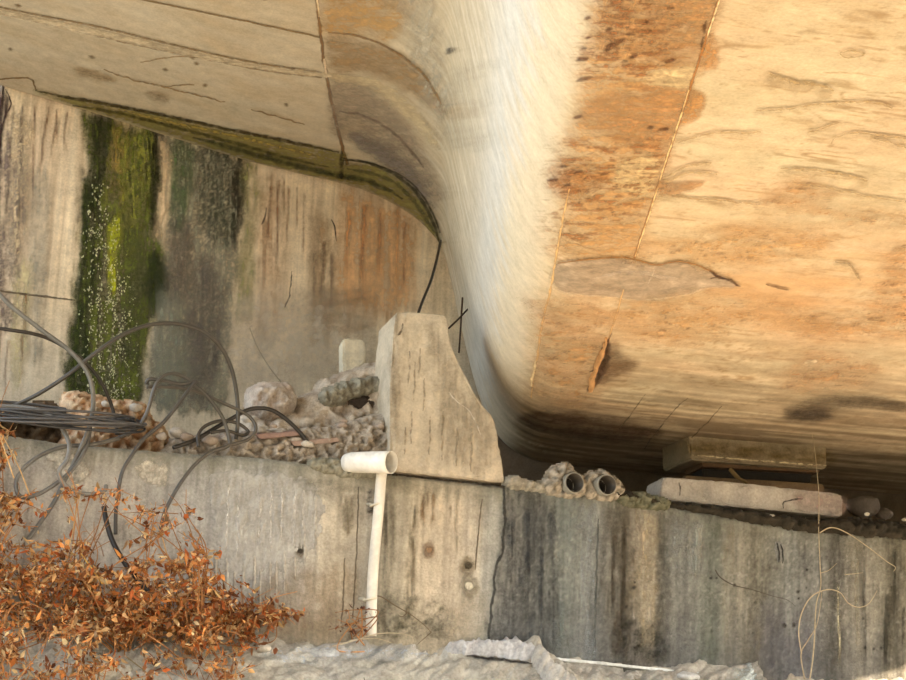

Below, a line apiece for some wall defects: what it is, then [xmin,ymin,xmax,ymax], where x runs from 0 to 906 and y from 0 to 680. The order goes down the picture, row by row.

water stain [35,8,447,408]
water stain [490,493,556,643]
water stain [608,517,660,647]
water stain [884,539,905,665]